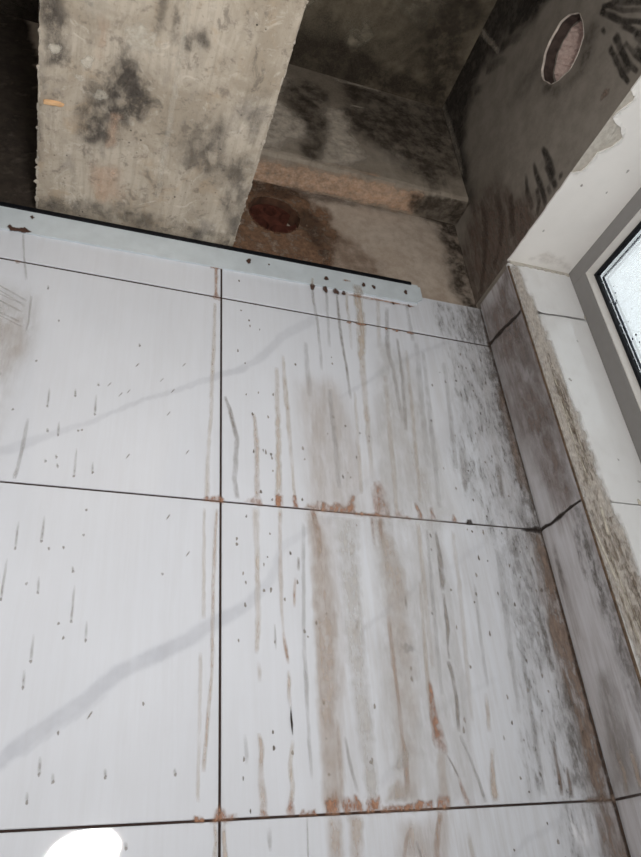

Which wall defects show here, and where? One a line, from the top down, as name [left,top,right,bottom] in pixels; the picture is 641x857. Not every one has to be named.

water stain [600,0,641,84]
water stain [84,63,143,142]
water stain [263,0,543,197]
peeling [571,90,638,175]
corrosion [312,486,390,530]
water stain [438,148,641,857]
corrosion [194,807,233,822]
corrosion [326,791,449,842]